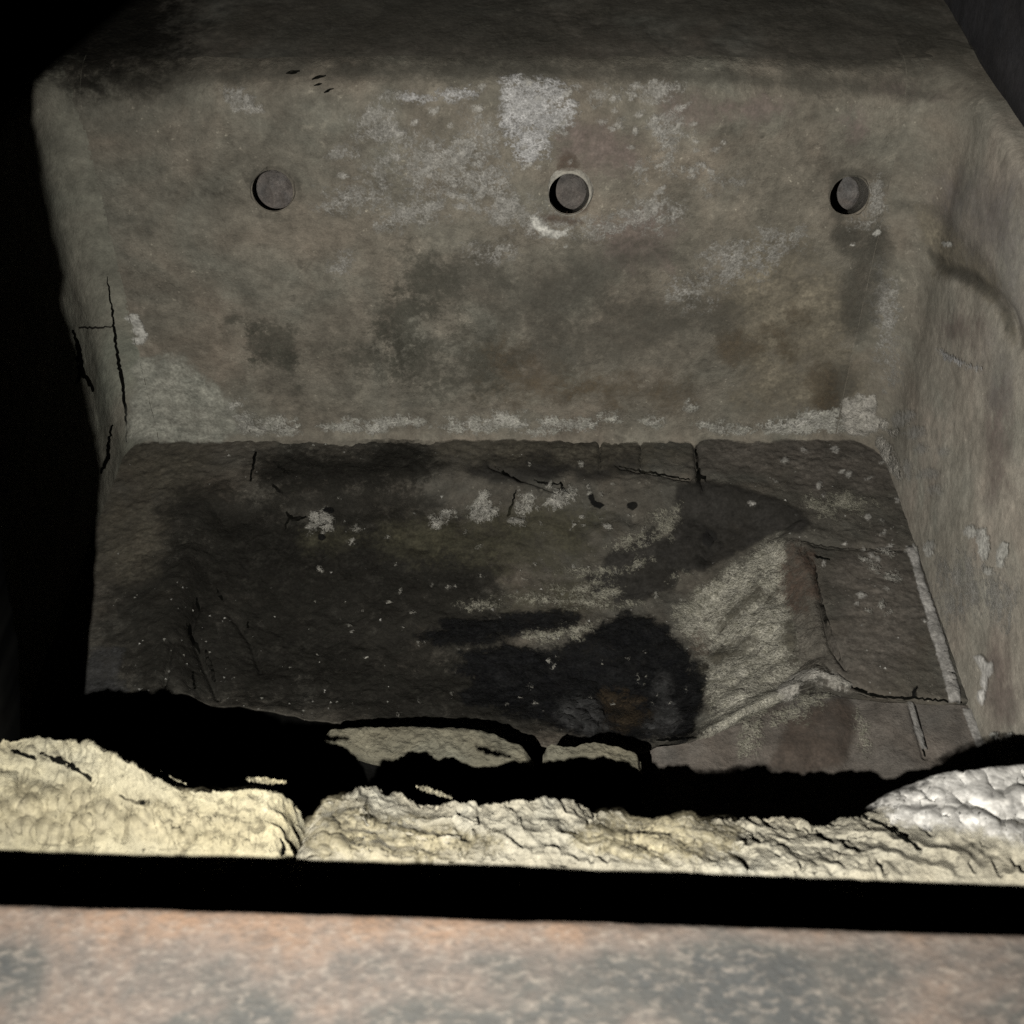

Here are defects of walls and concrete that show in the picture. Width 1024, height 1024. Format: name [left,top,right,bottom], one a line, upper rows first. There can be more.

leakage [313,73,683,247]
crack [72,277,128,474]
crack [493,466,567,517]
crack [599,443,706,483]
leakage [418,595,501,646]
leakage [510,502,684,643]
leakage [672,534,851,758]
crack [800,544,843,664]